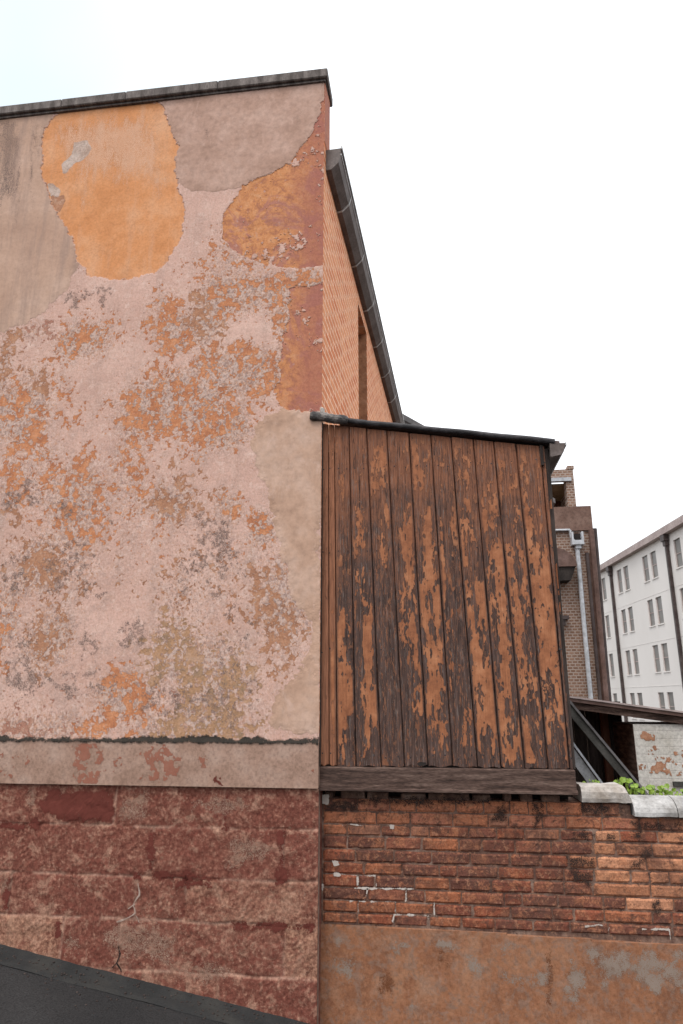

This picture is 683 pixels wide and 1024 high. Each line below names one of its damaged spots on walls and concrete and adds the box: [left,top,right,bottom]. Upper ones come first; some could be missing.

peeling [0,100,324,824]
peeling [322,426,571,767]
peeling [638,731,683,776]
crack [112,884,140,972]